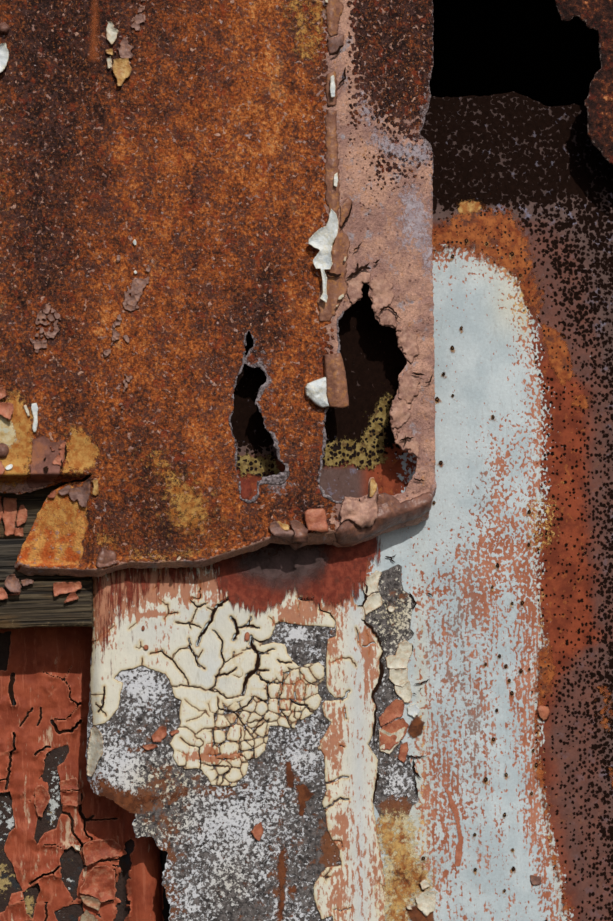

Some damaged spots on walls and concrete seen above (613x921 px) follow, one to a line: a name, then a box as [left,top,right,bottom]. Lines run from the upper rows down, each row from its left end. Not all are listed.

peeling [308,209,347,307]
corrosion [0,0,573,658]
peeling [0,388,38,432]
peeling [369,478,377,497]
crack [298,597,335,620]
crack [30,867,58,884]
crack [0,675,106,789]
spalling [0,556,425,921]
crack [141,580,318,786]
corrosion [376,814,428,921]
corrosion [445,787,464,866]
corrosion [533,645,570,912]